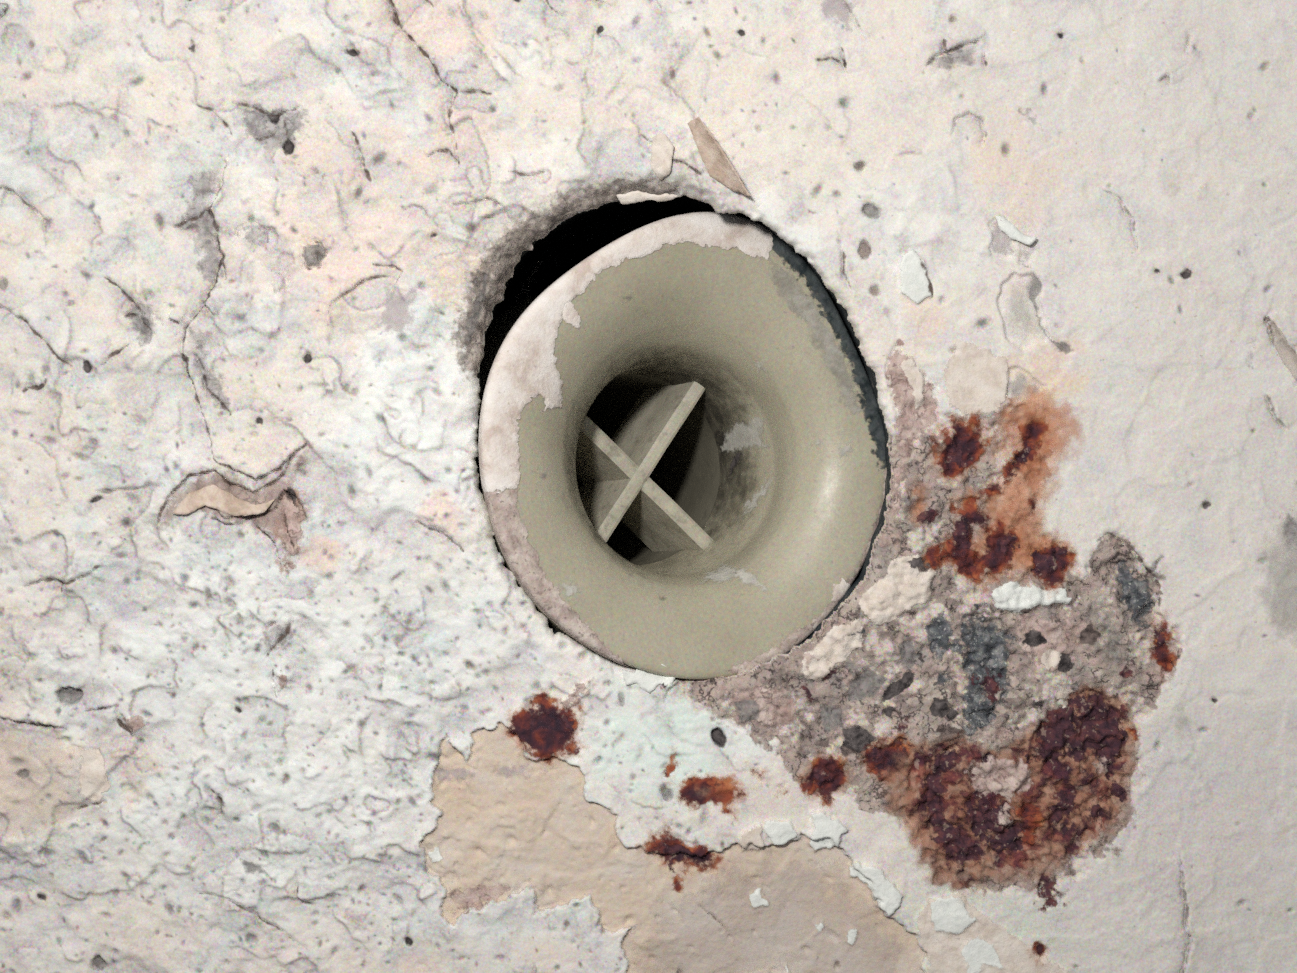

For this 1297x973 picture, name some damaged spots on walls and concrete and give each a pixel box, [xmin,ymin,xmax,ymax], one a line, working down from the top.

crack [352,132,371,181]
crack [389,0,491,164]
crack [19,317,68,391]
crack [107,167,306,548]
peeling [172,484,275,516]
corrosion [925,393,1076,590]
corrosion [508,681,590,762]
peeling [622,664,675,693]
corrosion [680,777,745,813]
peeling [419,722,1075,973]
spalling [690,339,1182,857]
corrosion [863,684,1137,910]